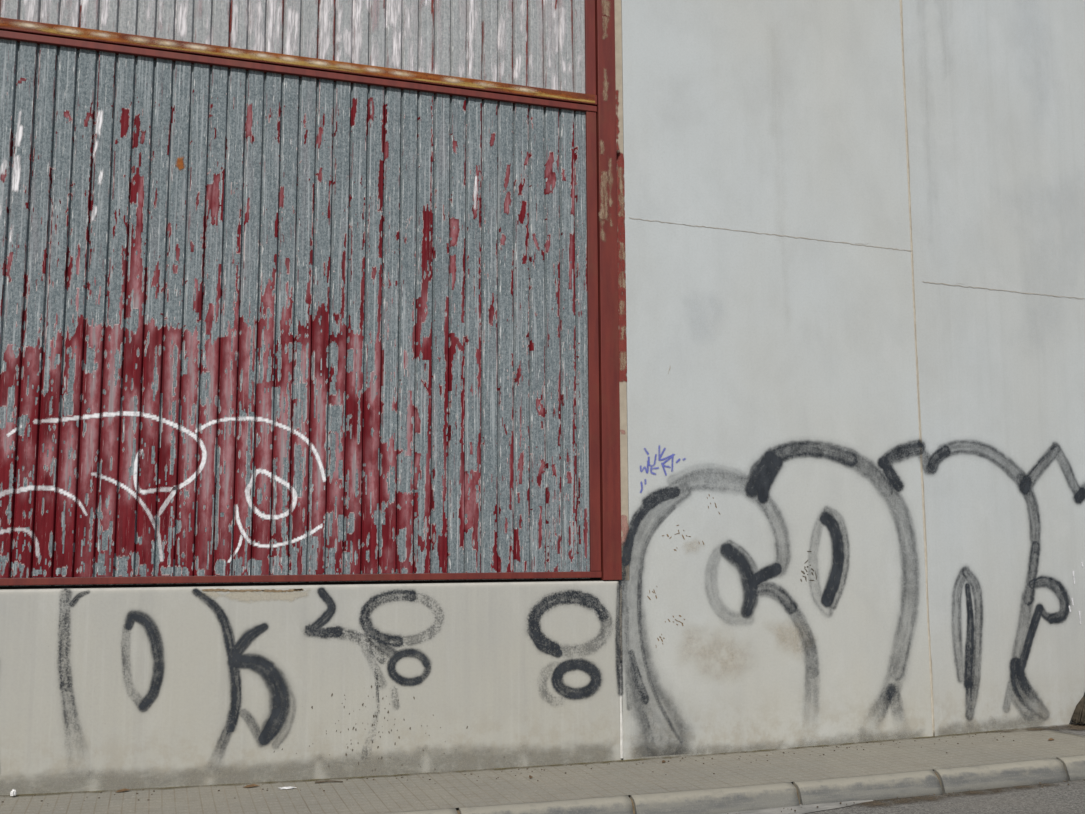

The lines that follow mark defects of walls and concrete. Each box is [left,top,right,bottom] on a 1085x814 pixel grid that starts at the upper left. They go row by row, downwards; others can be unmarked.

peeling [24,0,89,28]
peeling [175,0,188,36]
peeling [228,0,438,74]
peeling [459,0,484,78]
peeling [493,0,532,87]
peeling [542,0,580,90]
peeling [599,70,627,382]
peeling [0,50,588,578]
peeling [621,515,629,546]
spalling [202,588,306,601]